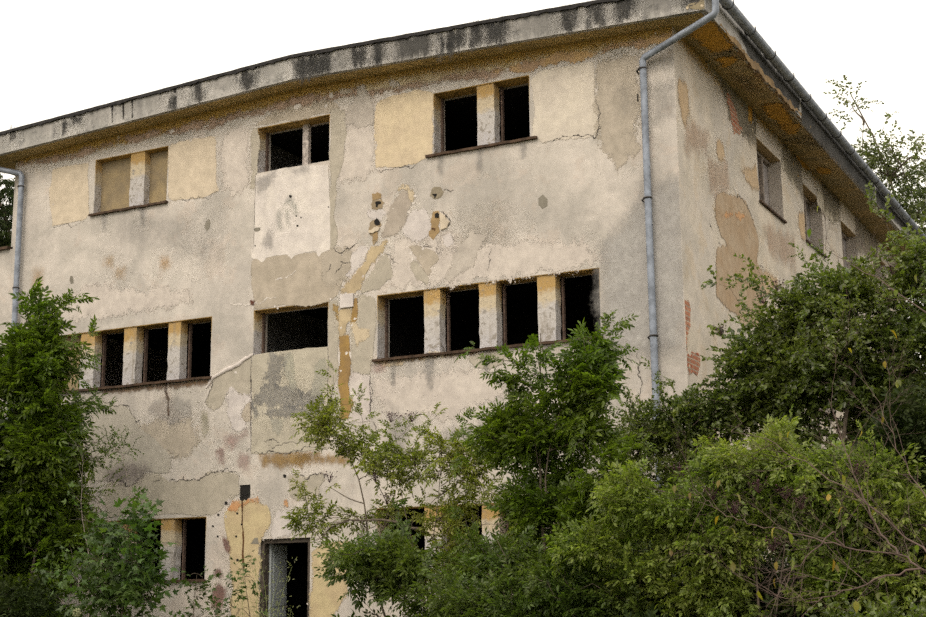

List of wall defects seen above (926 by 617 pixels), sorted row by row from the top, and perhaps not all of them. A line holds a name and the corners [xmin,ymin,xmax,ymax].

leakage [18,21,672,162]
leakage [562,9,577,31]
crack [545,103,601,142]
flaking render [705,61,756,138]
leakage [680,38,840,220]
spalling [714,21,811,128]
flaking render [18,29,700,425]
flaking render [714,189,765,326]
leakage [251,353,327,435]
flaking render [78,393,325,617]